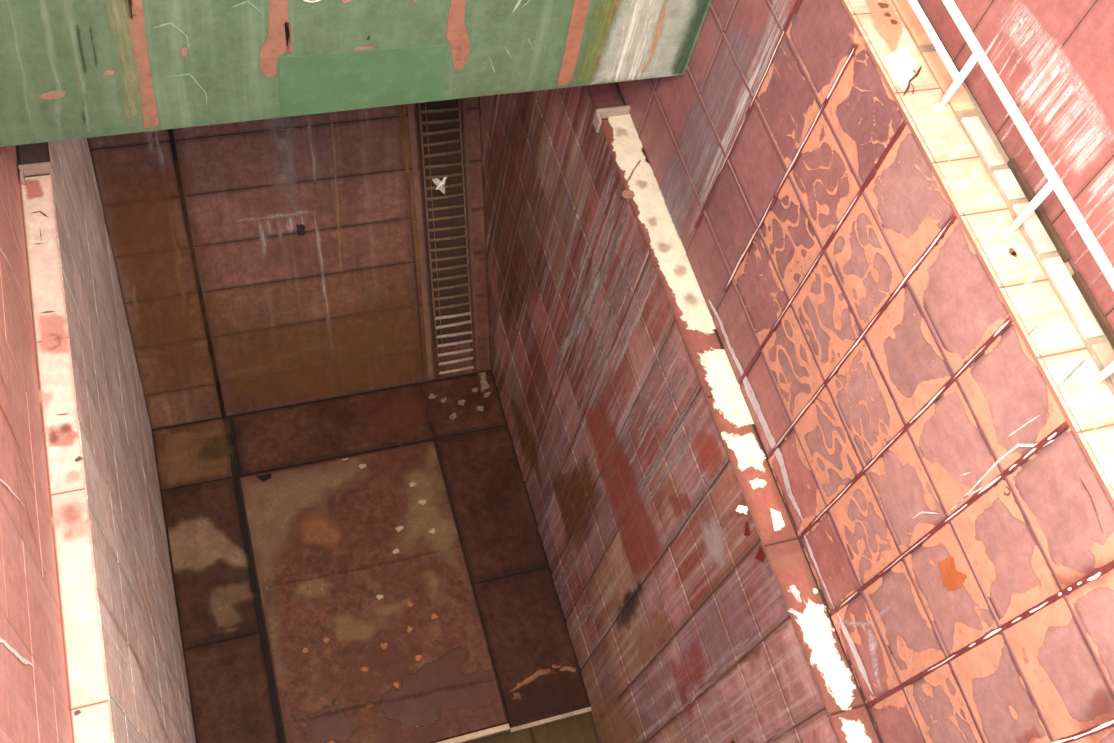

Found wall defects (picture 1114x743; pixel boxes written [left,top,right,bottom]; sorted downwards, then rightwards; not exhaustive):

corrosion [644,0,667,72]
peeling [867,0,902,50]
water stain [985,5,1110,191]
water stain [1085,169,1114,220]
peeling [608,22,1114,743]
corrosion [302,516,342,545]
corrosion [939,557,967,590]
corrosion [323,616,388,650]